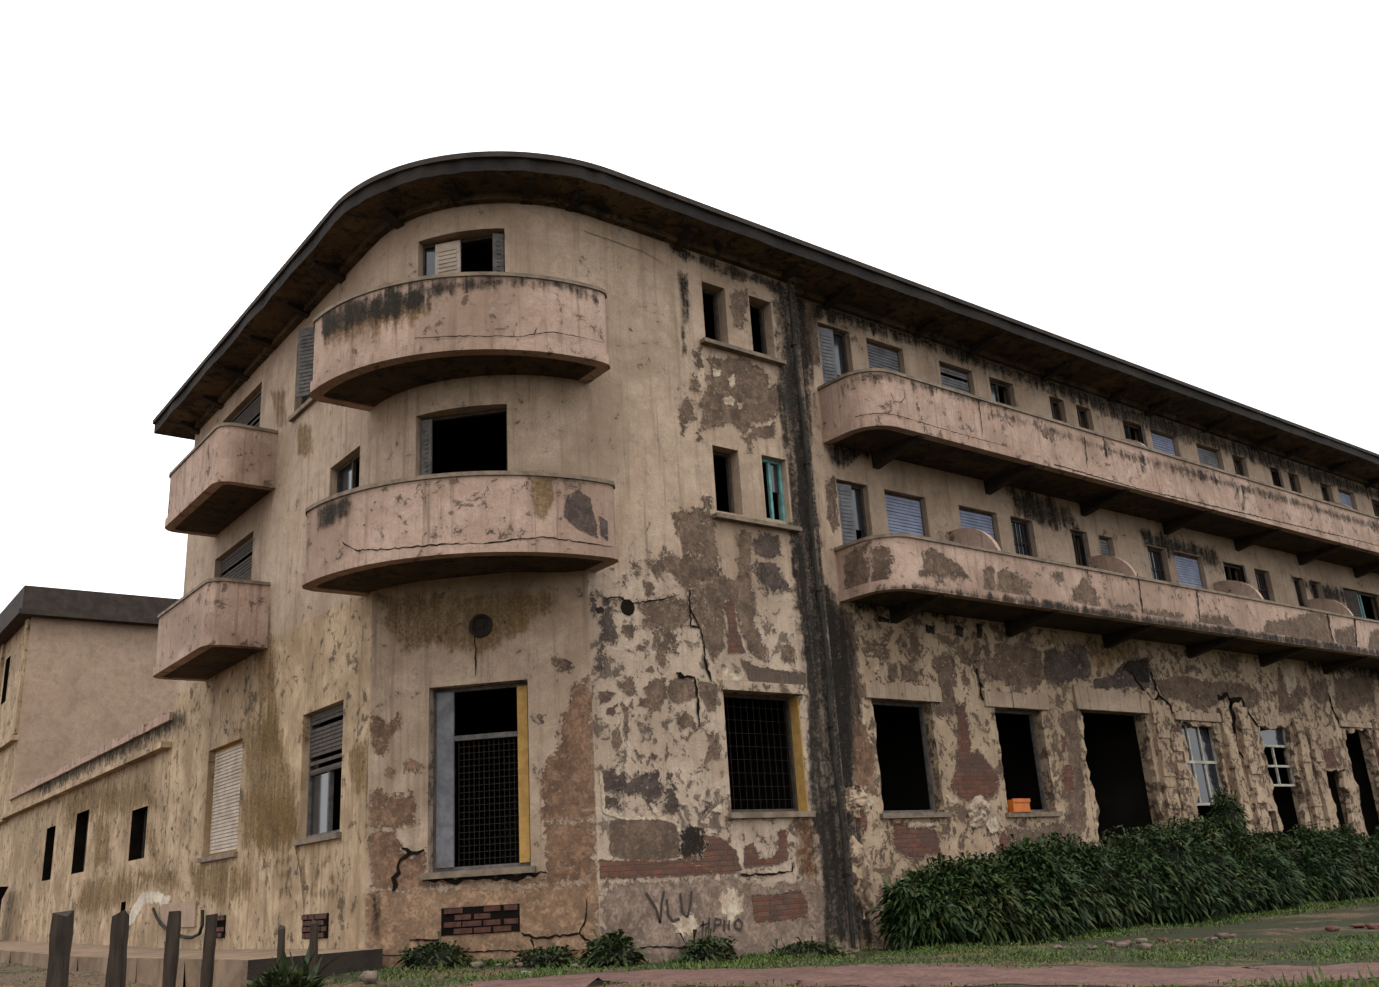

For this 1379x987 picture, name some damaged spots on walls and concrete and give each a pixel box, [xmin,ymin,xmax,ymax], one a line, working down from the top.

peeling [702,255,749,333]
peeling [676,346,783,455]
peeling [825,474,840,534]
peeling [843,541,899,590]
peeling [918,547,1033,597]
damp [670,244,1379,948]
peeling [1052,569,1234,628]
crack [605,590,712,727]
peeling [365,489,831,967]
flaking render [827,607,1379,861]
crack [1218,692,1259,759]
crack [391,847,547,891]